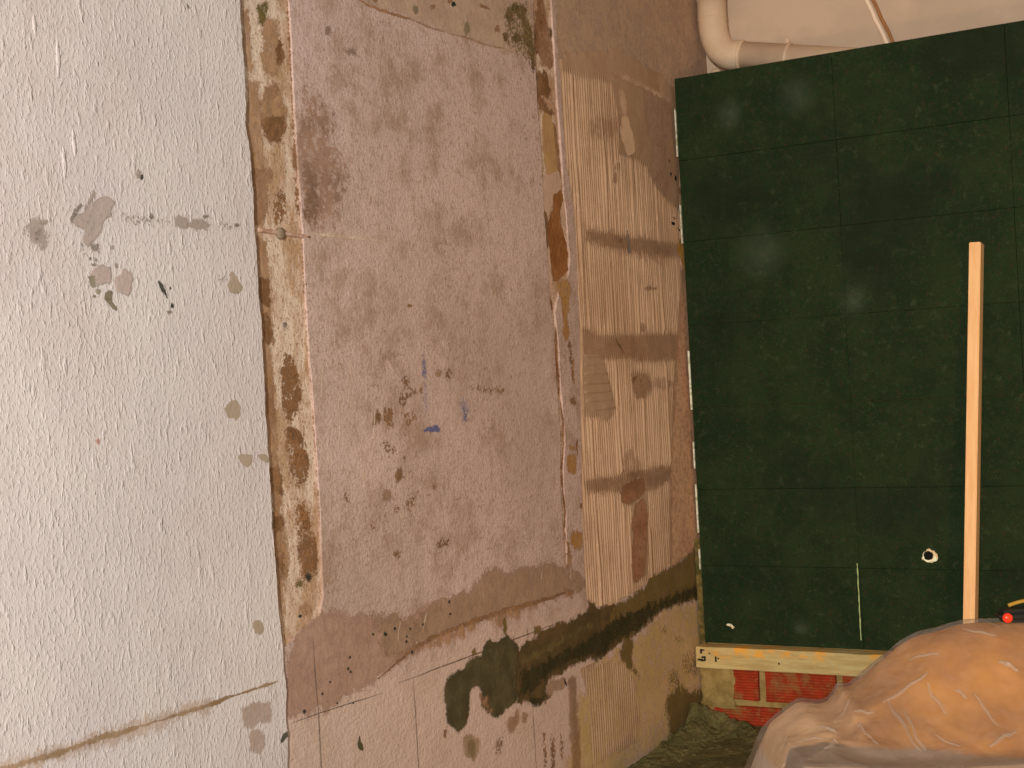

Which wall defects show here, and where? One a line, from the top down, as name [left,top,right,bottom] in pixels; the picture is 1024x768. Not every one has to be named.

peeling [70,190,133,311]
spalling [544,191,568,301]
leakage [444,547,703,768]